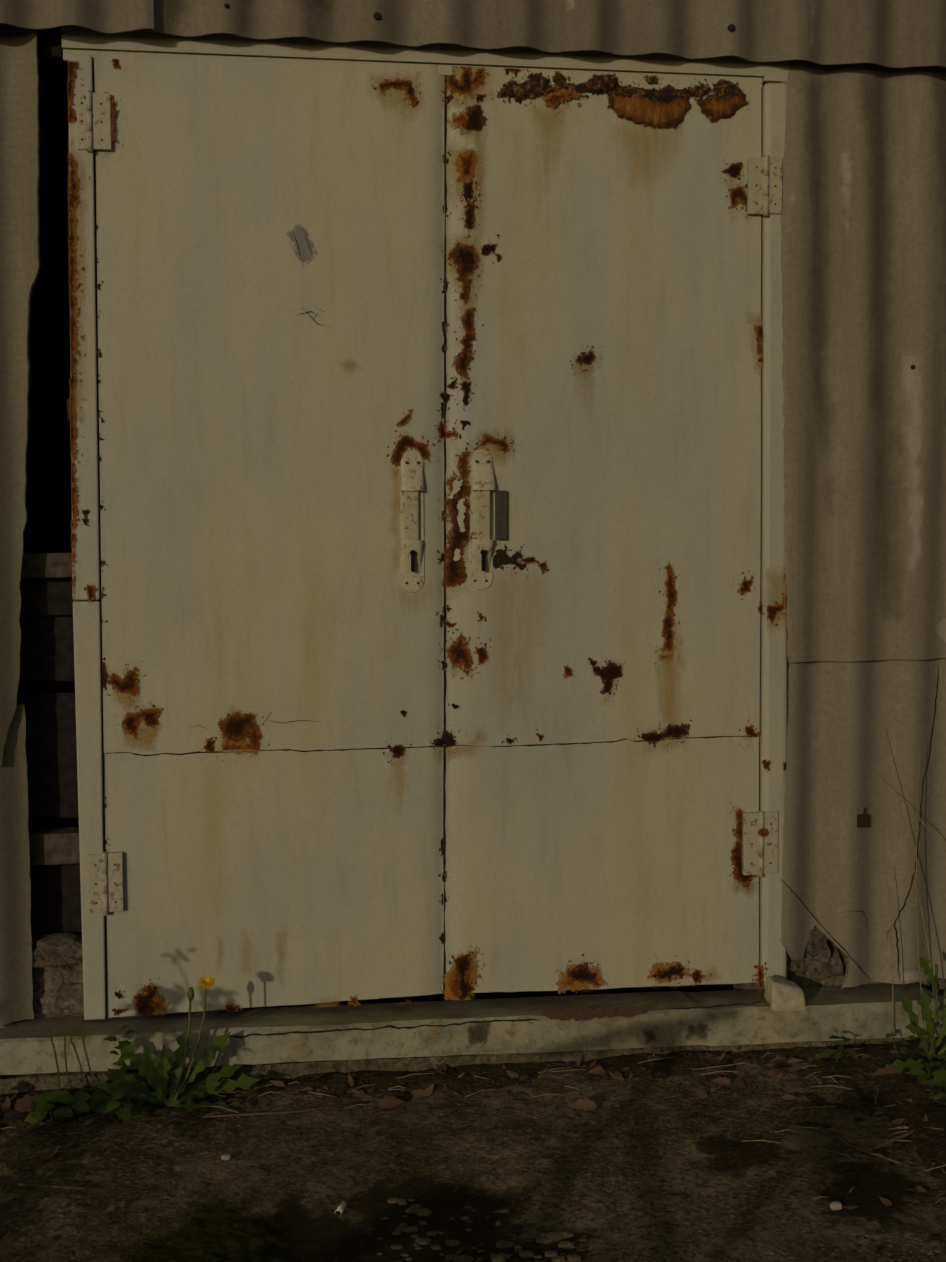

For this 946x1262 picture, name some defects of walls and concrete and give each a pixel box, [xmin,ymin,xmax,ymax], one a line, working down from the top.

corrosion [386,66,514,588]
corrosion [68,145,97,603]
corrosion [439,605,491,682]
corrosion [637,562,692,747]
corrosion [102,657,163,744]
corrosion [196,710,270,761]
corrosion [725,806,758,889]
crack [780,669,939,981]
corrosion [440,945,485,1000]
corrosion [556,954,615,994]
corrosion [647,955,711,989]
water stain [244,1194,379,1262]